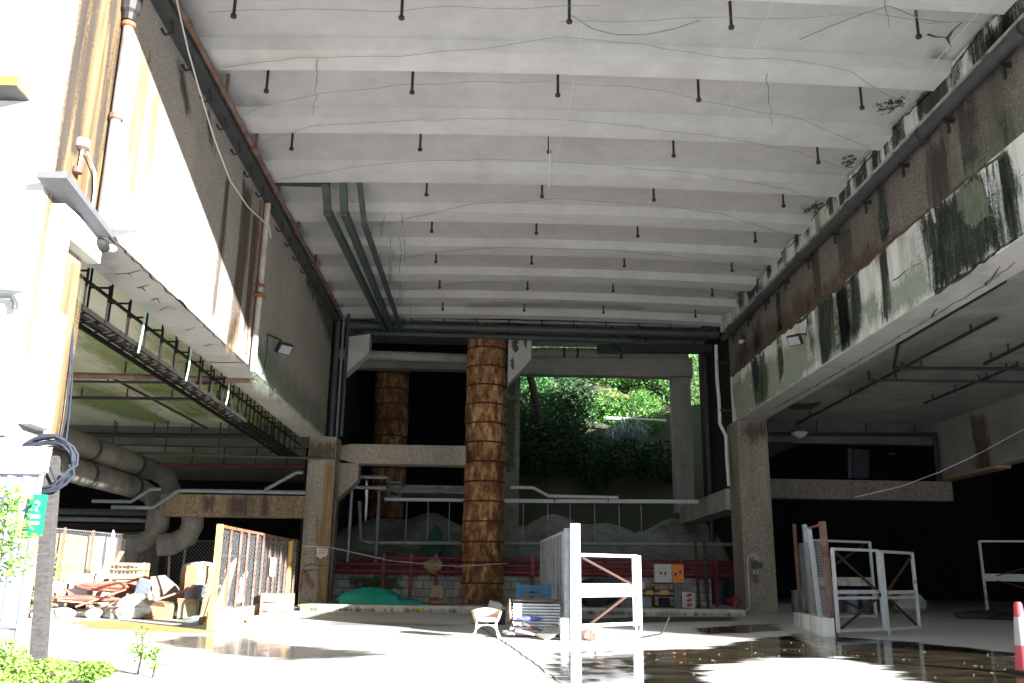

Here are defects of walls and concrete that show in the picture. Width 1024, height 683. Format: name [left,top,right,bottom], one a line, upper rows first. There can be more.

crack [927,22,963,47]
corrosion [735,232,898,371]
damp [812,229,861,364]
damp [875,188,892,323]
damp [920,98,1022,292]
corrosion [970,414,990,469]